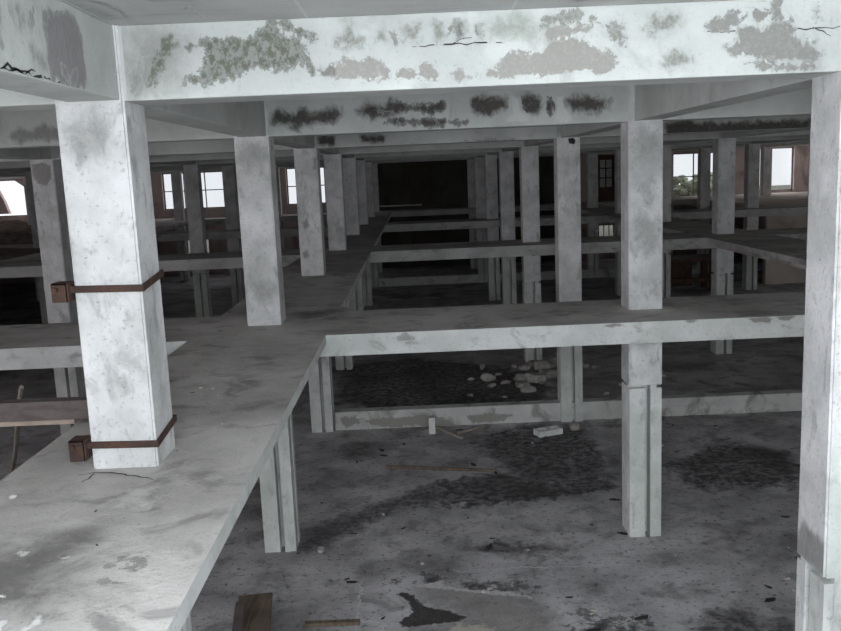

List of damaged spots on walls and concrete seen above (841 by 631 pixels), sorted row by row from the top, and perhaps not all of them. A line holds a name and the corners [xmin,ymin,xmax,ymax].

crack [0,62,60,83]
leakage [0,0,319,100]
peeling [316,54,439,85]
leakage [330,0,628,56]
peeling [449,23,620,84]
leakage [639,4,697,77]
peeling [704,0,827,73]
crack [797,26,840,36]
leakage [267,90,614,148]
leakage [333,356,558,409]
leakage [291,418,622,561]
leakage [661,436,801,500]